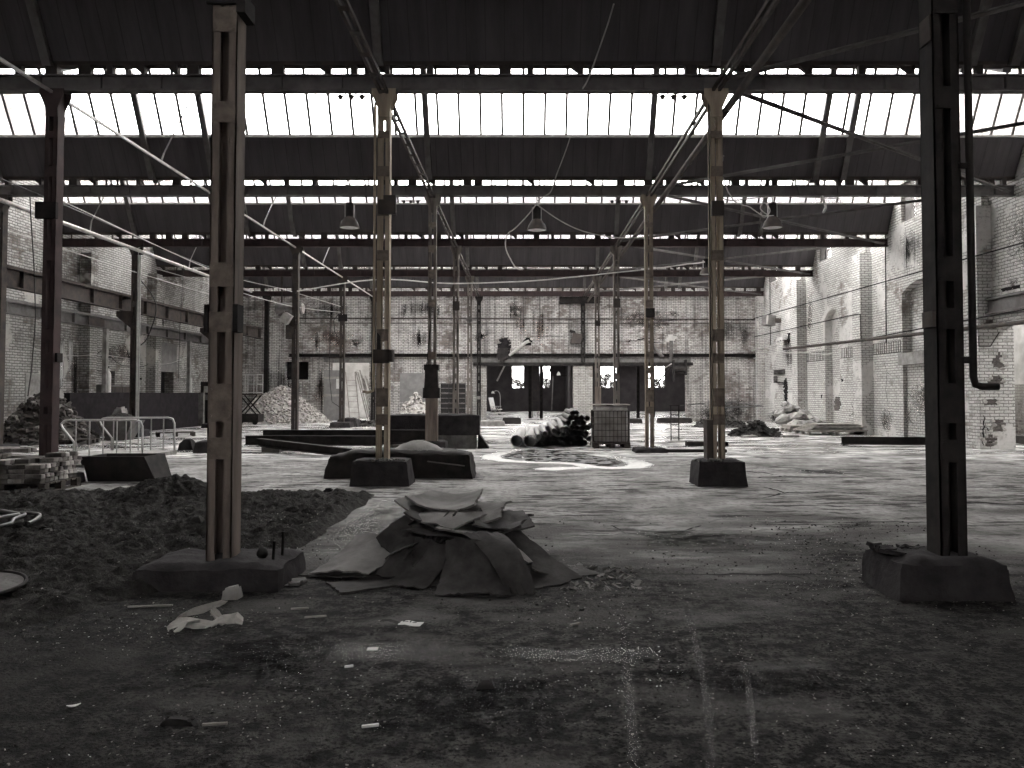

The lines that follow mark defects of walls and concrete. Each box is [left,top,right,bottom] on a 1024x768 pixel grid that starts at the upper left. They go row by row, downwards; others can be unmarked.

spalling [985,352,1009,385]
spalling [981,419,1007,447]